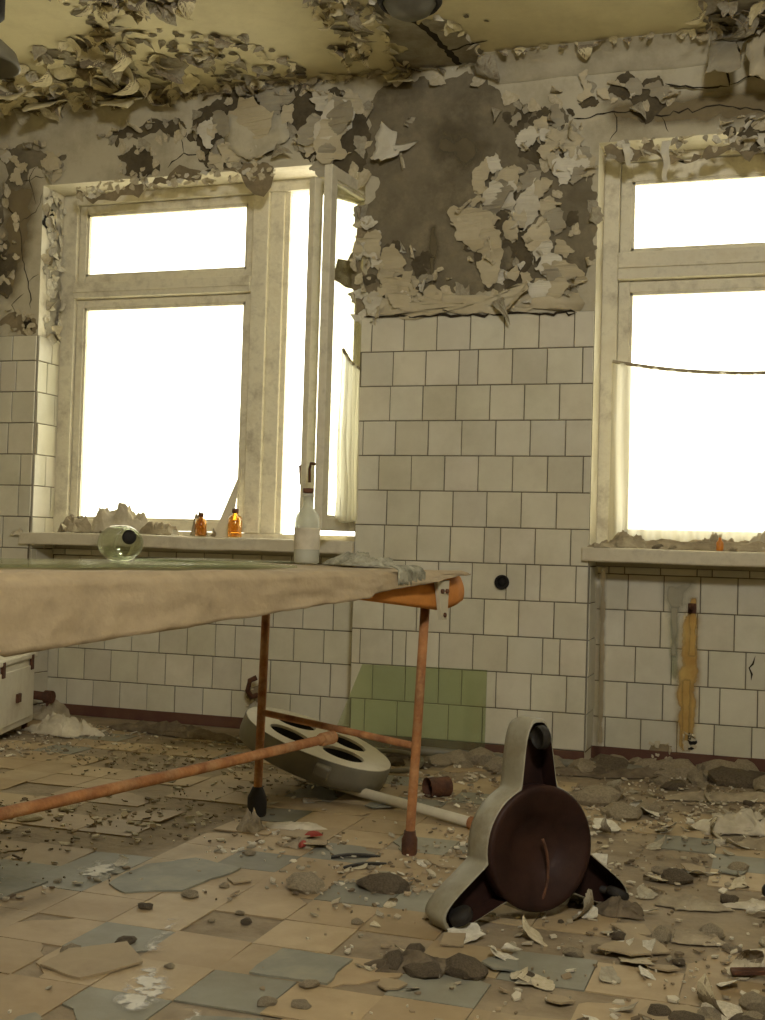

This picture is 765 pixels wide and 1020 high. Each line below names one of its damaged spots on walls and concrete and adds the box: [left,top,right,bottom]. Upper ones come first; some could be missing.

peeling [0,0,765,346]
crack [411,21,485,65]